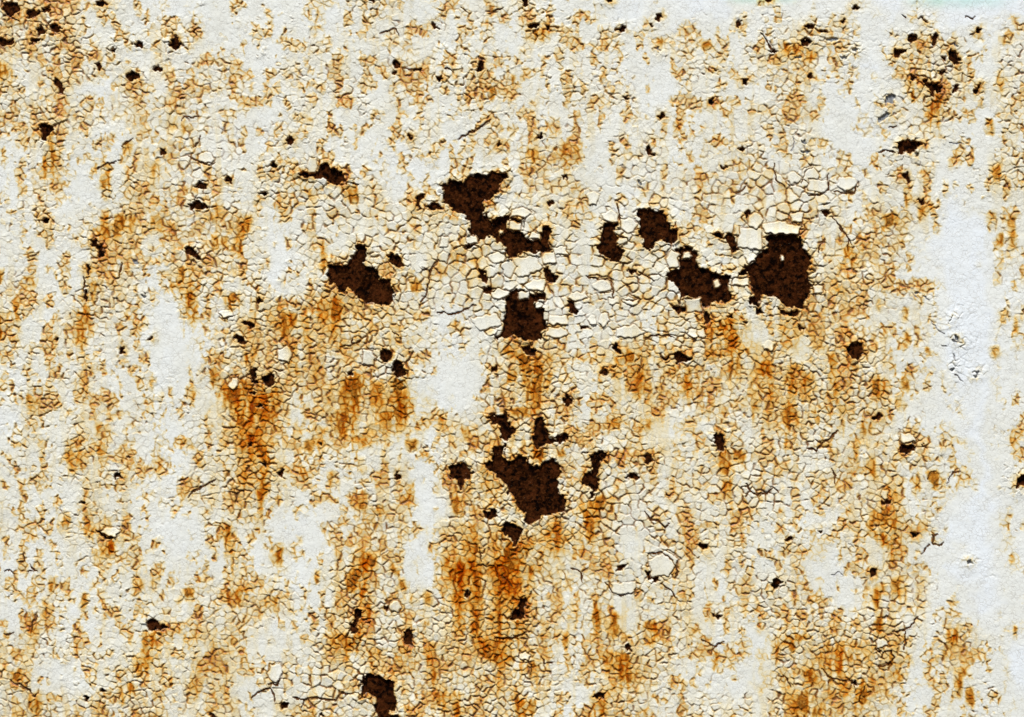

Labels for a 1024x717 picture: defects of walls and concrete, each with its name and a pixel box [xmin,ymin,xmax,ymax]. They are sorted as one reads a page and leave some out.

crack [773,137,859,253]
peeling [320,233,412,312]
crack [421,260,477,315]
peeling [407,166,824,370]
rust [227,381,267,499]
rust [337,377,361,430]
rust [388,380,407,419]
peeling [439,385,610,553]
crack [570,511,680,598]
rust [486,543,521,660]
crack [251,681,350,708]
peeling [350,666,409,717]